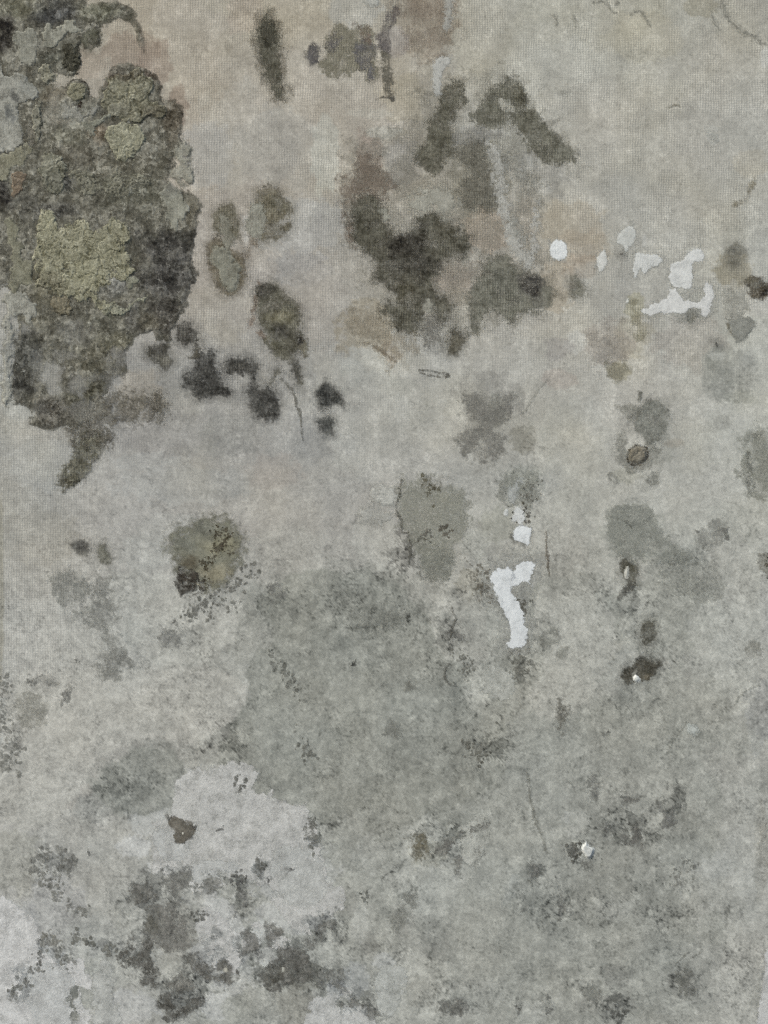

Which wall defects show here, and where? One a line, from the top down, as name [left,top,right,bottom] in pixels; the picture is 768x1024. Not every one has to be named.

damp [305,7,399,102]
mould [417,77,576,214]
mould [0,0,308,492]
damp [335,155,552,362]
mould [570,275,584,298]
peeling [596,250,608,272]
peeling [617,226,755,342]
mould [316,382,343,434]
peeling [483,478,544,654]